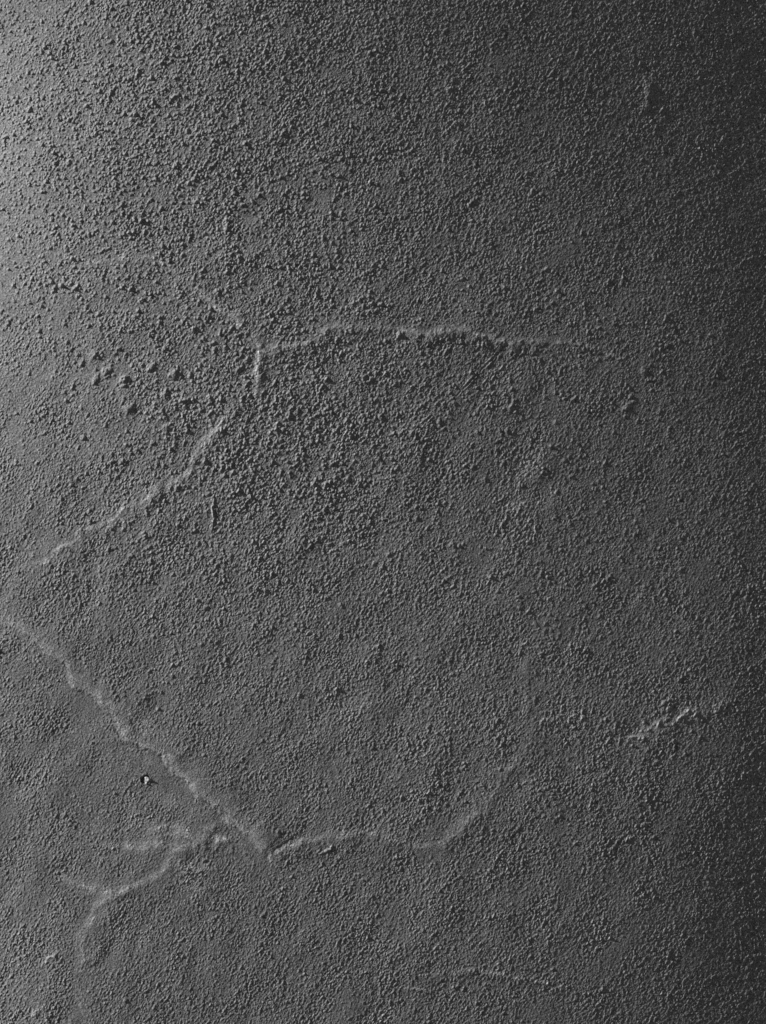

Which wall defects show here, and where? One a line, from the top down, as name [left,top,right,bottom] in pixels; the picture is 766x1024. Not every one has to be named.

crack [81,253,631,415]
crack [414,966,572,994]